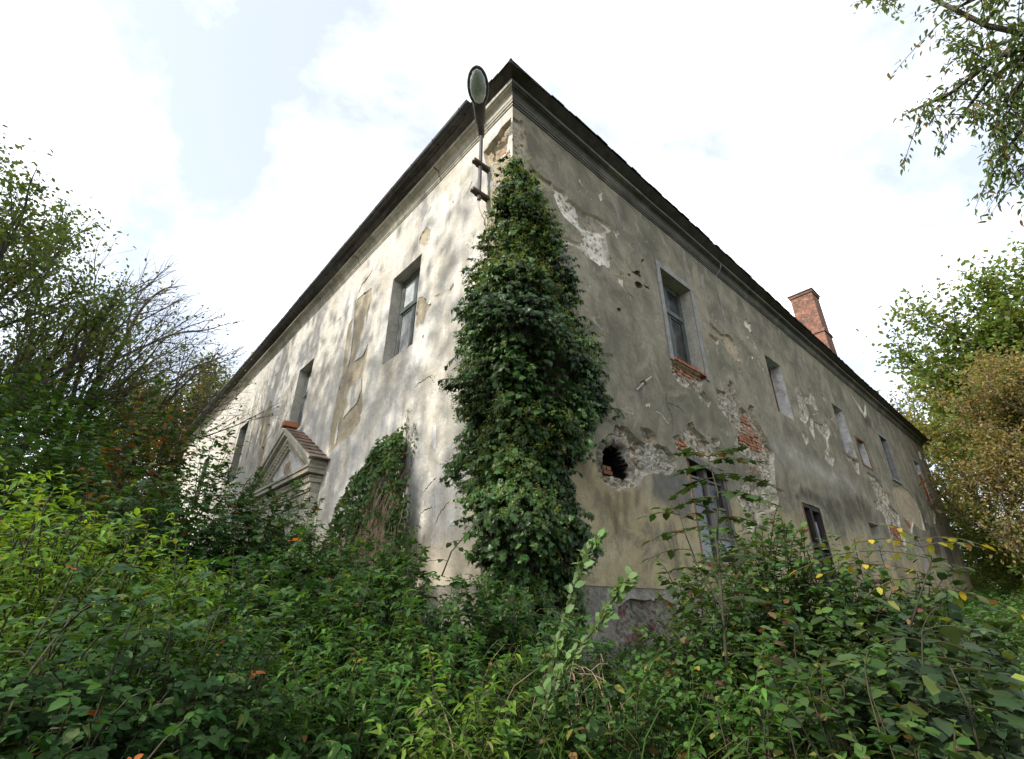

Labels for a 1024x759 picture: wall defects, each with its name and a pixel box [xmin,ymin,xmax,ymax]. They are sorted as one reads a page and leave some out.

spalling [483,117,649,291]
spalling [596,421,721,492]
spalling [672,310,779,533]
spalling [795,385,942,551]